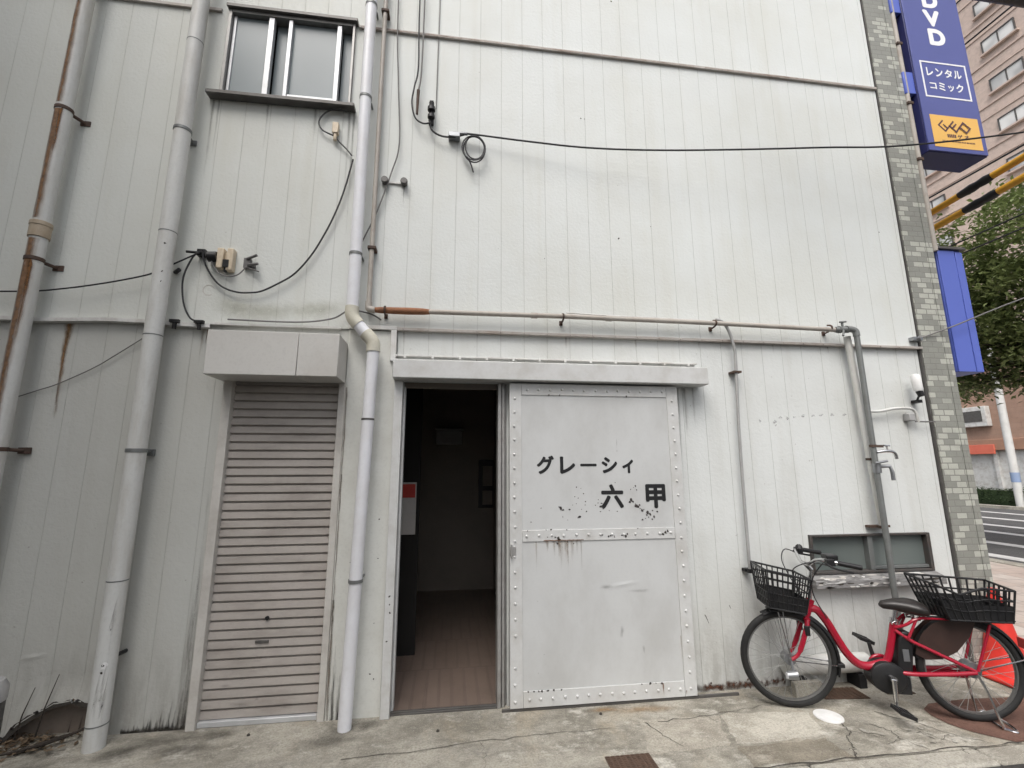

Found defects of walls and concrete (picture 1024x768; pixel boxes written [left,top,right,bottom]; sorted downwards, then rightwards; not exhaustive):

corrosion [34,0,81,217]
corrosion [0,237,35,401]
corrosion [57,324,71,391]